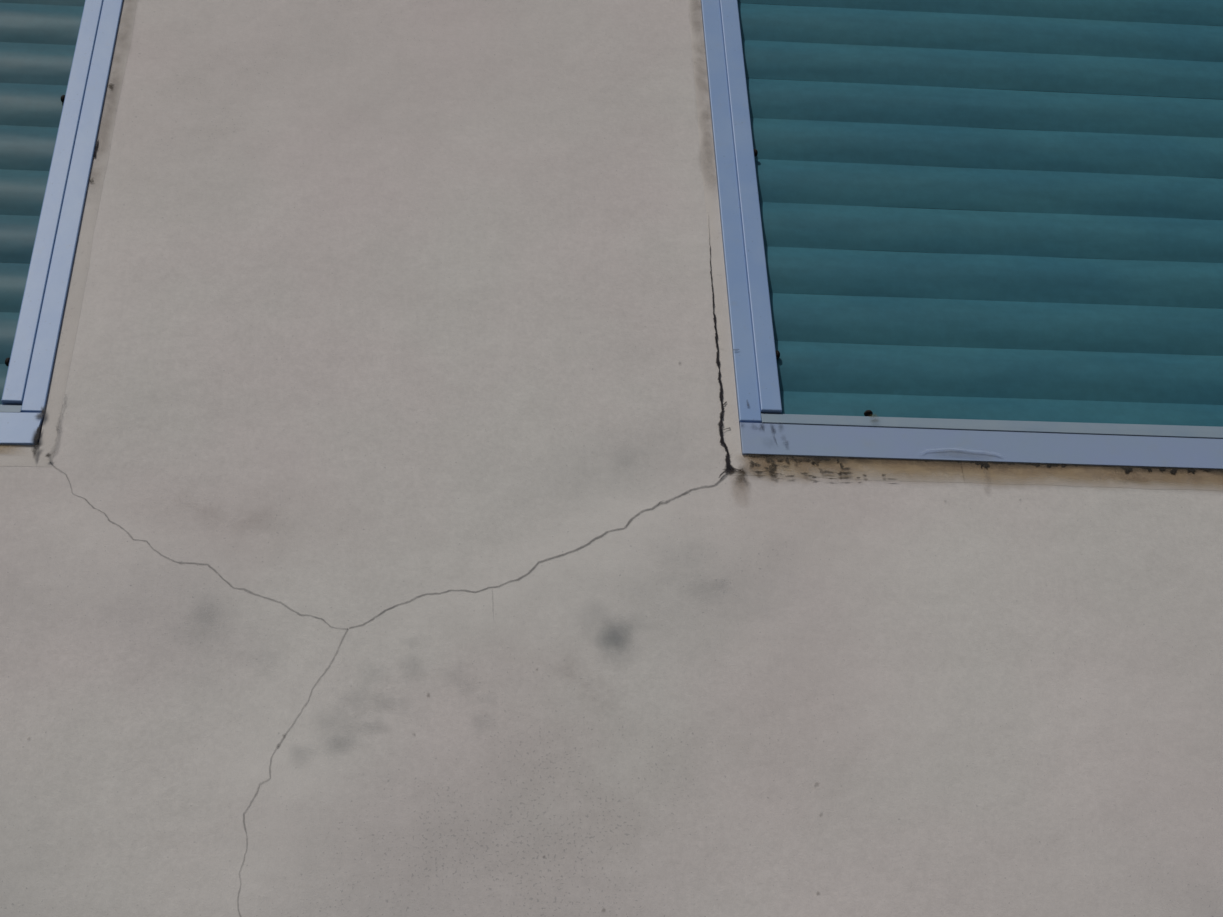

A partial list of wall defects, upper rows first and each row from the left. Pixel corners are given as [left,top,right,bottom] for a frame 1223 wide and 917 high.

crack [681,233,742,495]